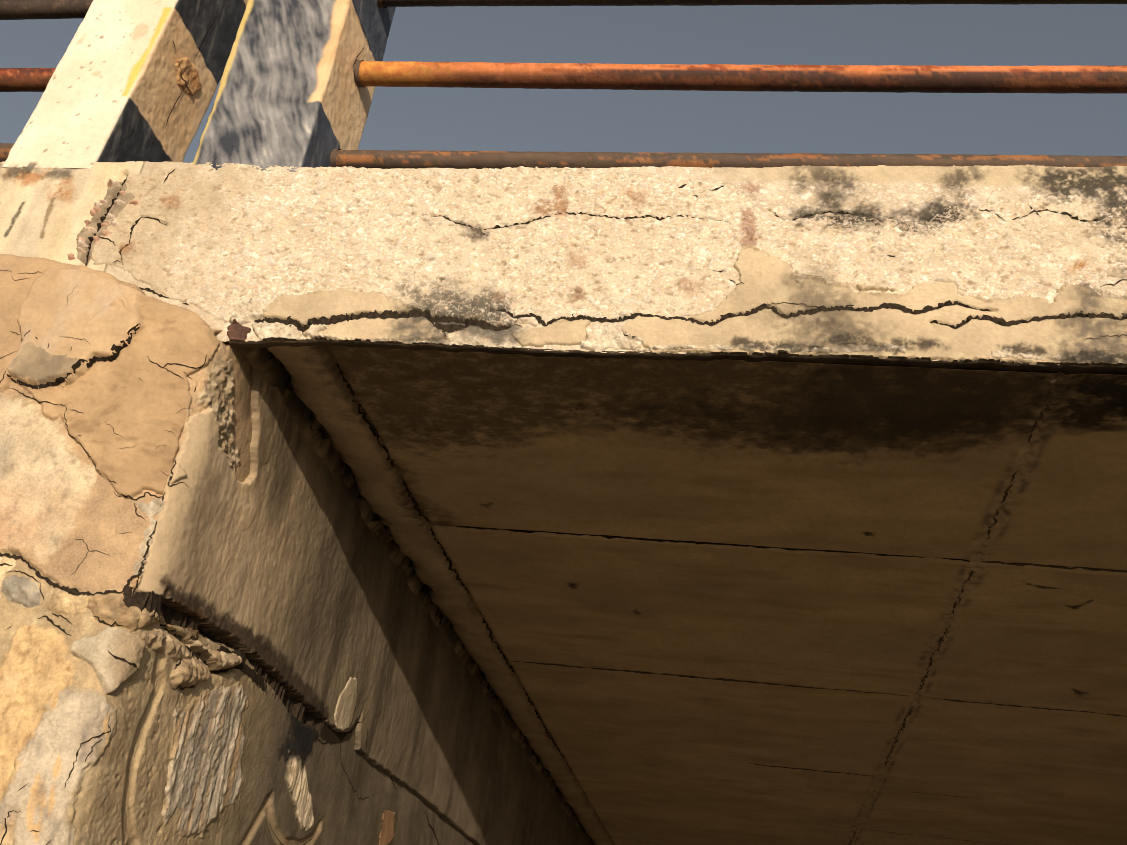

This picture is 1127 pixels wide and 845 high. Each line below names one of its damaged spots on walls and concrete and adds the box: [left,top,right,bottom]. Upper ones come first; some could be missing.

spalling [175,57,202,96]
crack [67,175,167,305]
crack [423,182,723,236]
crack [769,210,866,220]
crack [976,206,1101,222]
crack [254,270,1127,340]
spalling [0,162,1127,598]
crack [0,287,369,800]
spalling [0,623,146,845]
spalling [161,681,250,839]
spalling [284,755,314,831]
peeling [334,677,358,731]